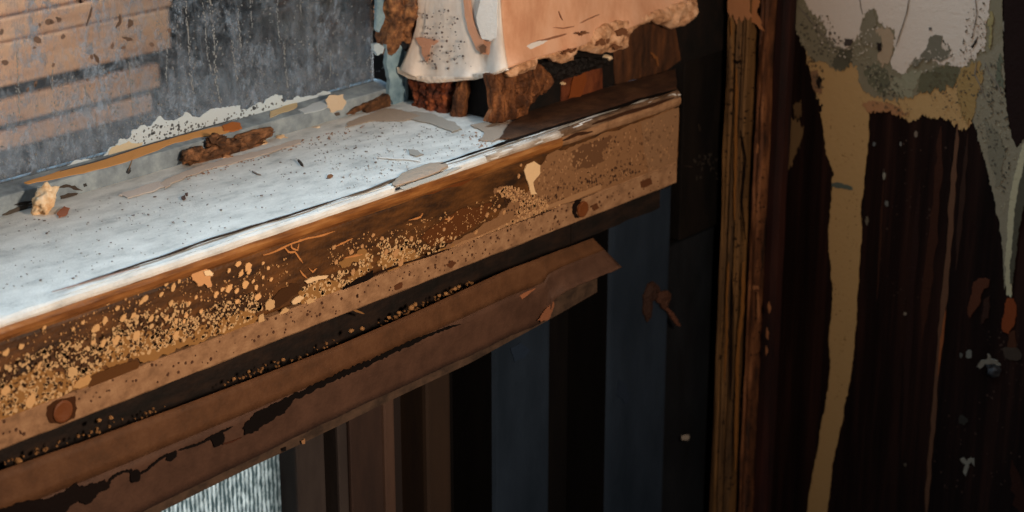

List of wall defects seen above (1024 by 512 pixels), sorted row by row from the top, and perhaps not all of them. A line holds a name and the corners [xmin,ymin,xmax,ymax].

peeling [371,43,384,56]
flaking render [463,0,491,55]
spalling [502,0,699,78]
peeling [844,8,894,67]
peeling [911,27,951,68]
spalling [1004,0,1024,146]
peeling [298,94,346,116]
peeling [305,245,338,283]
peeling [71,261,315,348]
rust [46,396,77,424]
peeling [243,401,293,435]
peeling [0,479,111,512]